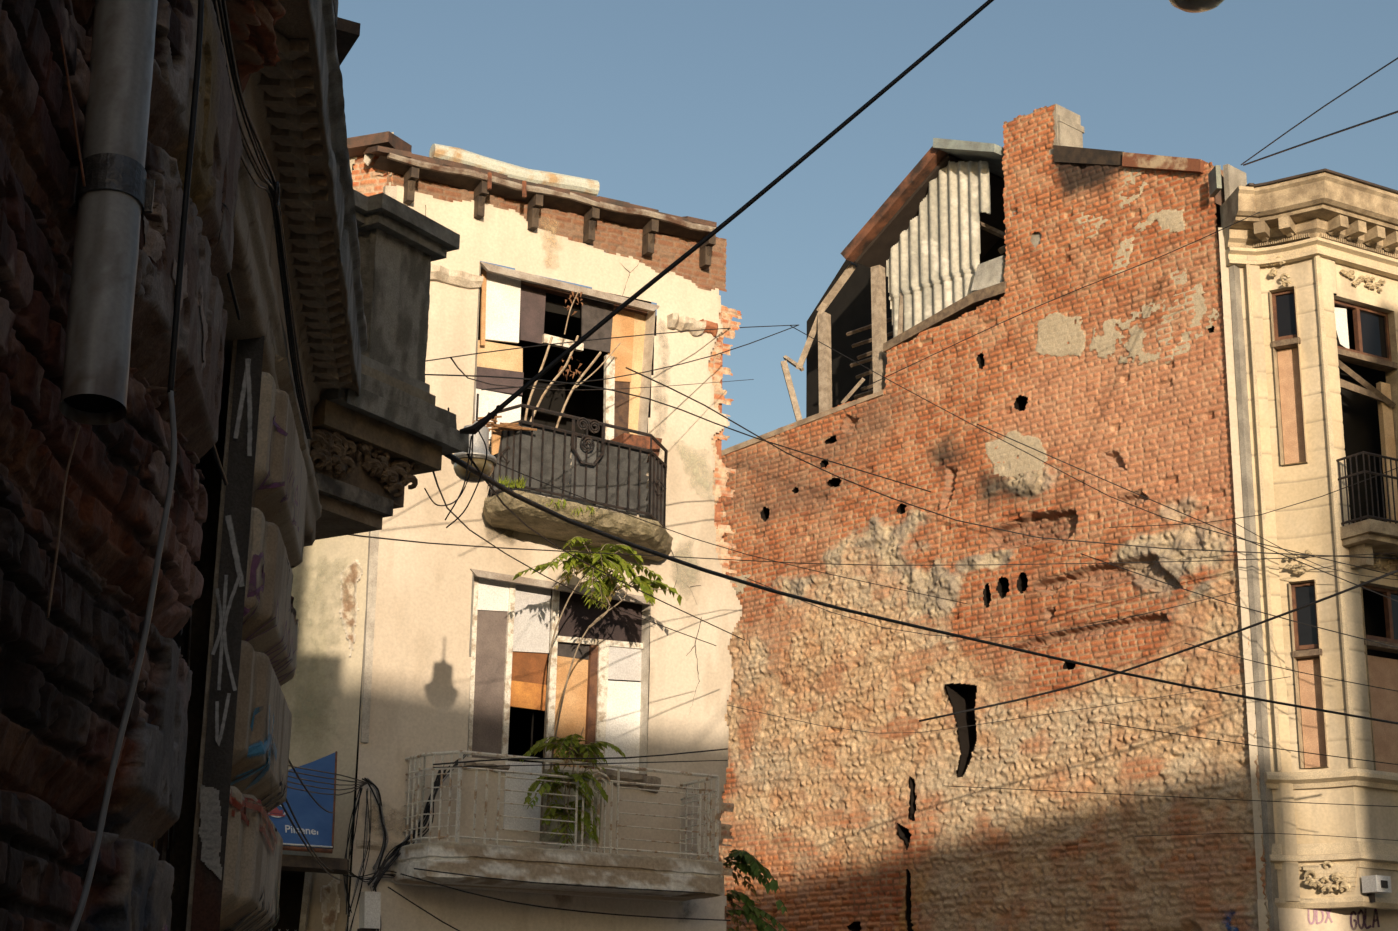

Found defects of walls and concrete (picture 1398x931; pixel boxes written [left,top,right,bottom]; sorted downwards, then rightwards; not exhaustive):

peeling [143,202,208,375]
spalling [352,154,742,597]
spalling [820,414,859,487]
spalling [939,466,958,511]
spalling [987,508,1078,549]
spalling [1101,450,1127,471]
spalling [1117,488,1150,511]
spalling [983,551,1184,652]
spalling [719,789,735,886]
spalling [847,921,862,931]